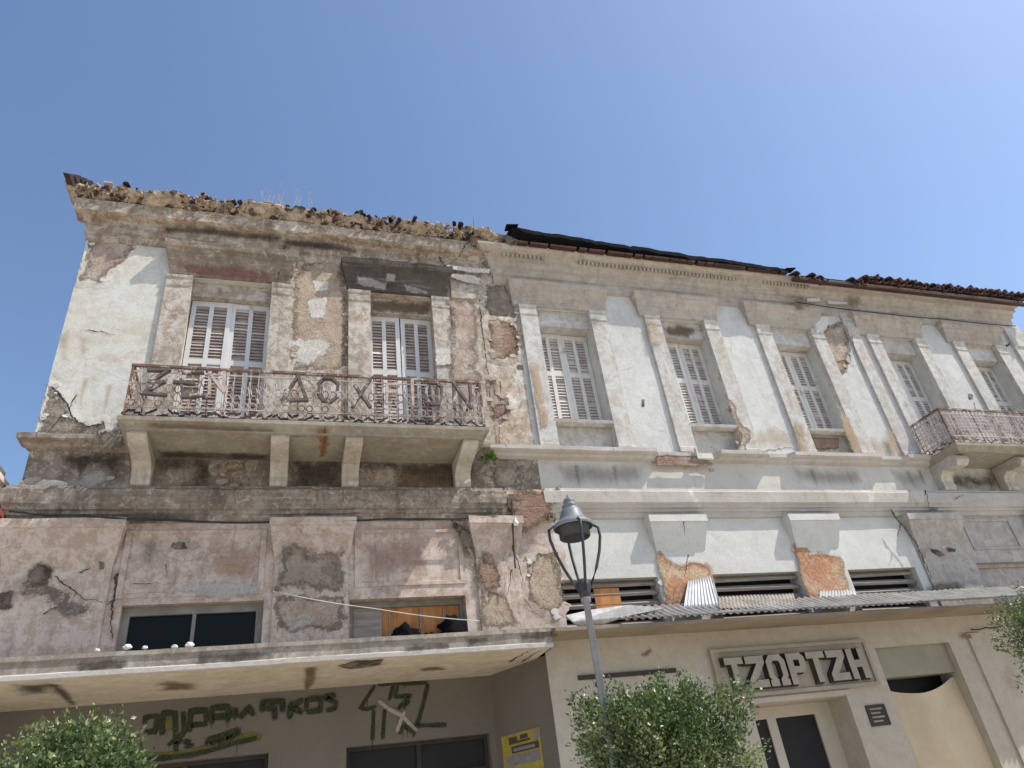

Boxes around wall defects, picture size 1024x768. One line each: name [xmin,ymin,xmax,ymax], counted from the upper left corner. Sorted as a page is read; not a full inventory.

flaking render [75,240,145,289]
flaking render [435,265,548,432]
flaking render [824,317,857,381]
flaking render [35,379,134,448]
corrosion [318,429,328,456]
flaking render [481,459,560,533]
crack [55,564,170,640]
flaking render [273,543,352,633]
flaking render [519,544,571,626]
flaking render [657,551,715,606]
flaking render [791,544,849,598]
crack [890,509,931,576]